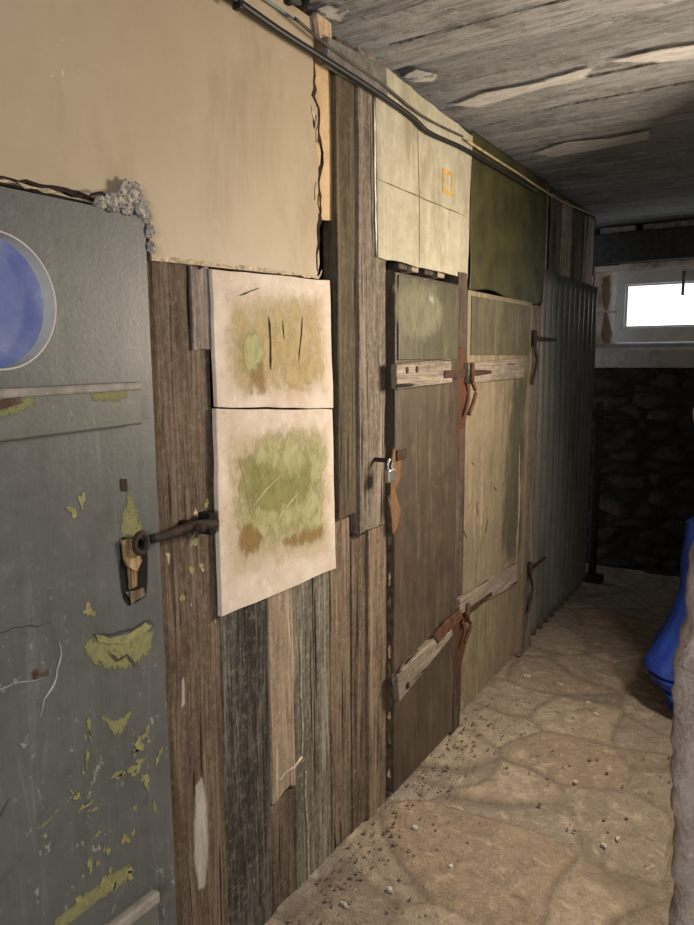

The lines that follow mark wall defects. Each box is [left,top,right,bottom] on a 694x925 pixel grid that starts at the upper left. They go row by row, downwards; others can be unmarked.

crack [312,56,324,271]
rust [457,347,471,476]
peeling [84,619,154,670]
rust [455,612,467,705]
peeling [101,711,132,734]
peeling [110,724,163,816]
peeling [54,846,133,925]